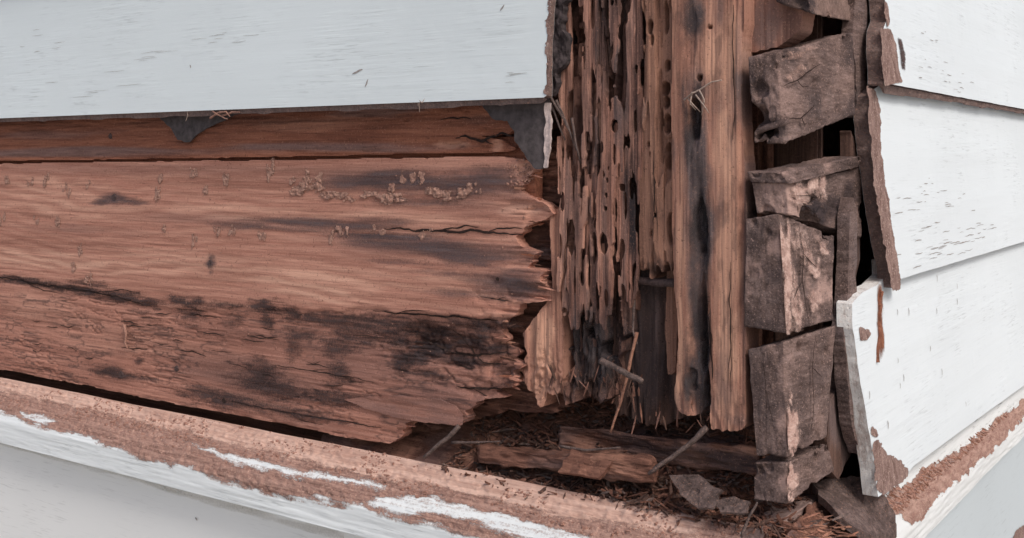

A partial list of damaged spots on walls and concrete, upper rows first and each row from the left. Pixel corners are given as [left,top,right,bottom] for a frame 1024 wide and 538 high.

peeling [543,0,553,95]
peeling [866,1,906,291]
crack [0,277,371,387]
water stain [1,275,513,422]
water stain [239,218,539,296]
crack [385,225,523,235]
peeling [808,242,829,312]
peeling [859,327,871,341]
peeling [0,377,751,538]
peeling [812,399,1024,538]